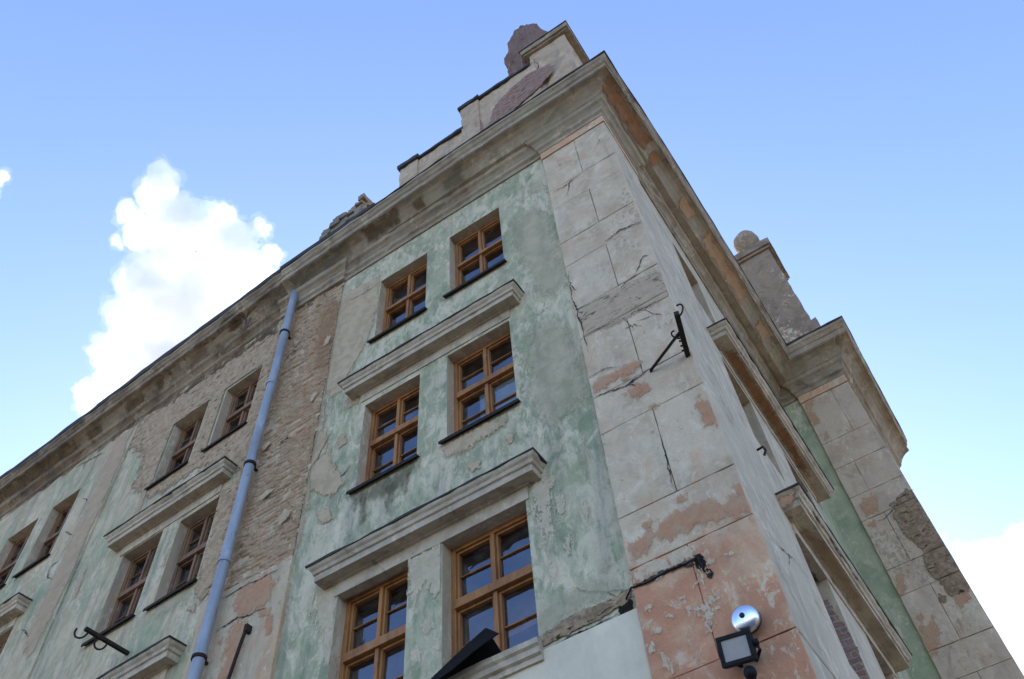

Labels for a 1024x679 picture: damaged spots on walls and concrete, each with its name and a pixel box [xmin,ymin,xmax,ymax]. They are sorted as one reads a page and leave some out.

flaking render [474,63,553,131]
peeling [592,357,660,409]
peeling [694,393,718,428]
flaking render [128,276,380,679]
peeling [529,473,574,555]
peeling [540,482,751,674]
flaking render [859,488,972,609]